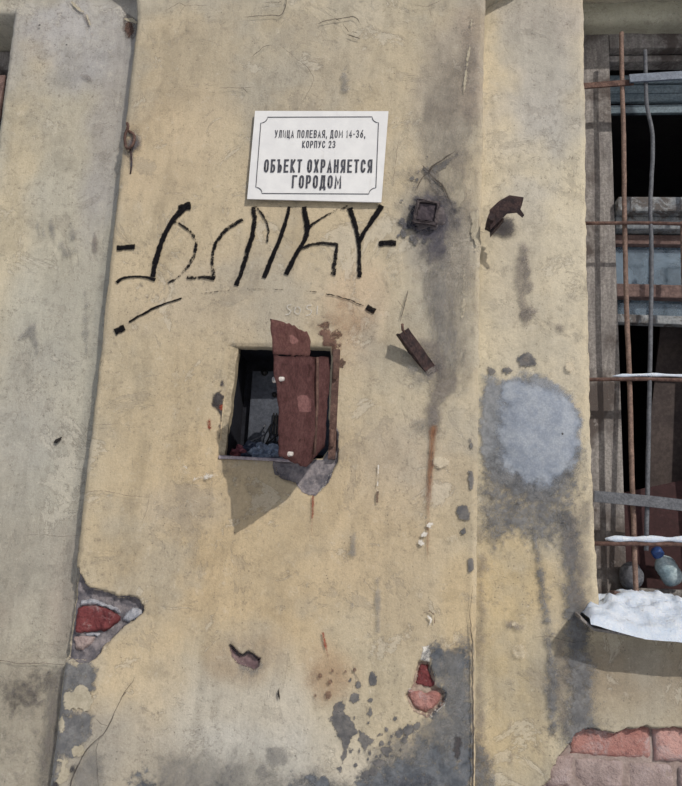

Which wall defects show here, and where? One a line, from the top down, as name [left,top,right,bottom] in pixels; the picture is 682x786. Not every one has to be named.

spalling [122,14,137,39]
damp [409,144,469,429]
spalling [273,429,339,496]
corrosion [428,426,436,499]
spalling [51,571,144,786]
crack [70,673,136,786]
spalling [229,644,260,672]
peeling [288,775,332,786]
peeling [330,643,474,786]
spalling [542,726,682,786]